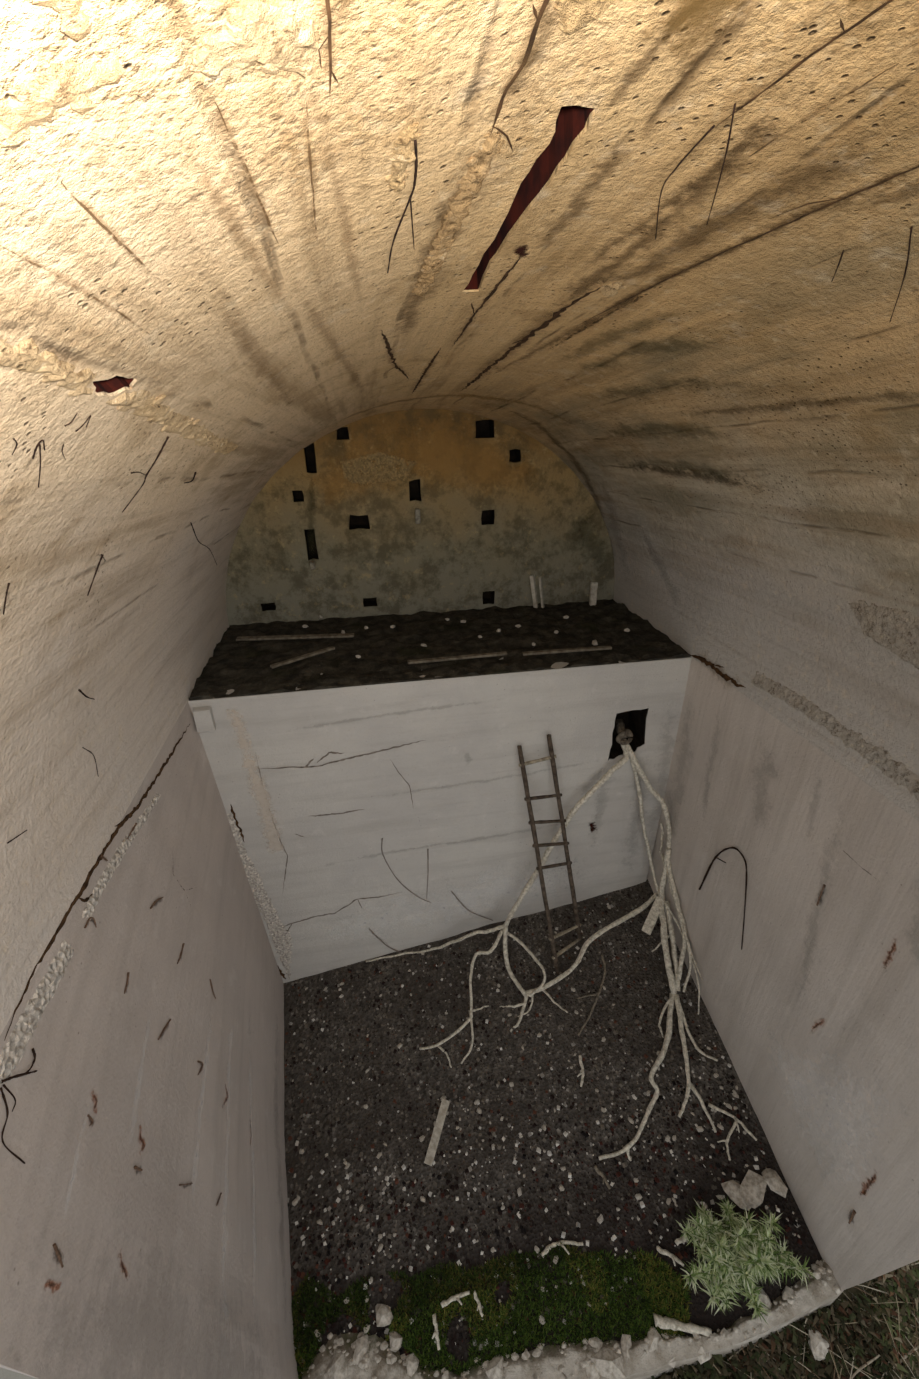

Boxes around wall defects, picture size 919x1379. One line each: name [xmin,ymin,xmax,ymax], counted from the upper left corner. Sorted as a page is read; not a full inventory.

crack [491,0,550,151]
water stain [666,0,736,52]
crack [715,0,899,127]
crack [461,166,919,391]
spalling [0,338,239,455]
crack [691,655,746,688]
spalling [849,600,919,669]
spalling [751,671,919,801]
crack [4,724,190,1041]
crack [230,740,425,932]
rust [848,1175,876,1224]
rust [45,1243,64,1291]